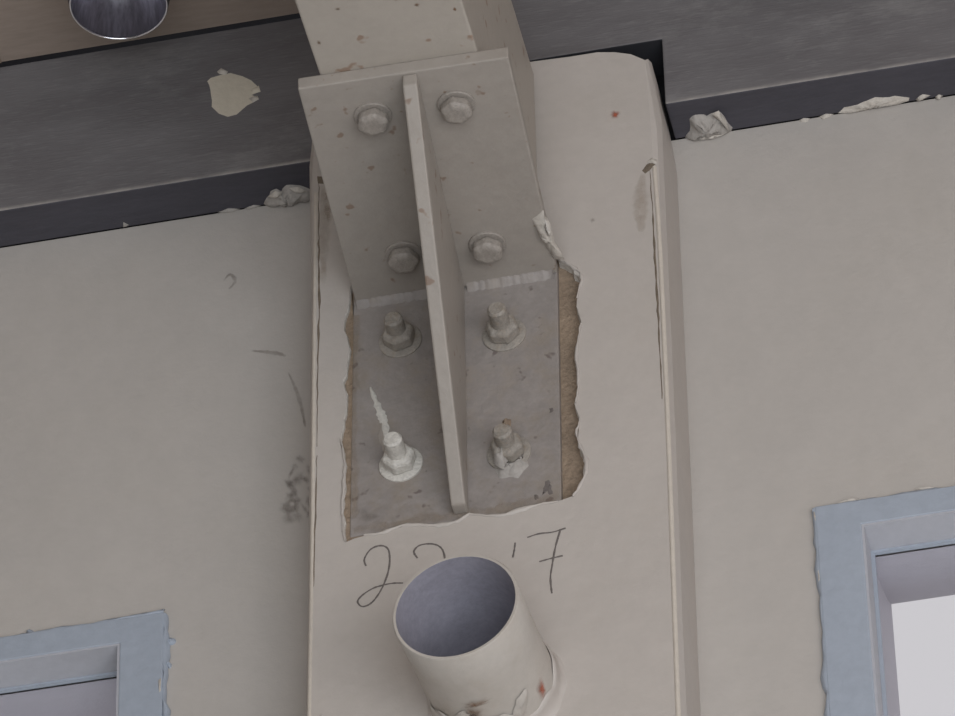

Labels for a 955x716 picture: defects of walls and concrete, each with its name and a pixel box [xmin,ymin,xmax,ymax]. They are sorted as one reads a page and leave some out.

peeling [207,68,261,117]
peeling [712,111,729,130]
peeling [799,94,942,122]
peeling [268,187,307,198]
spalling [340,210,589,542]